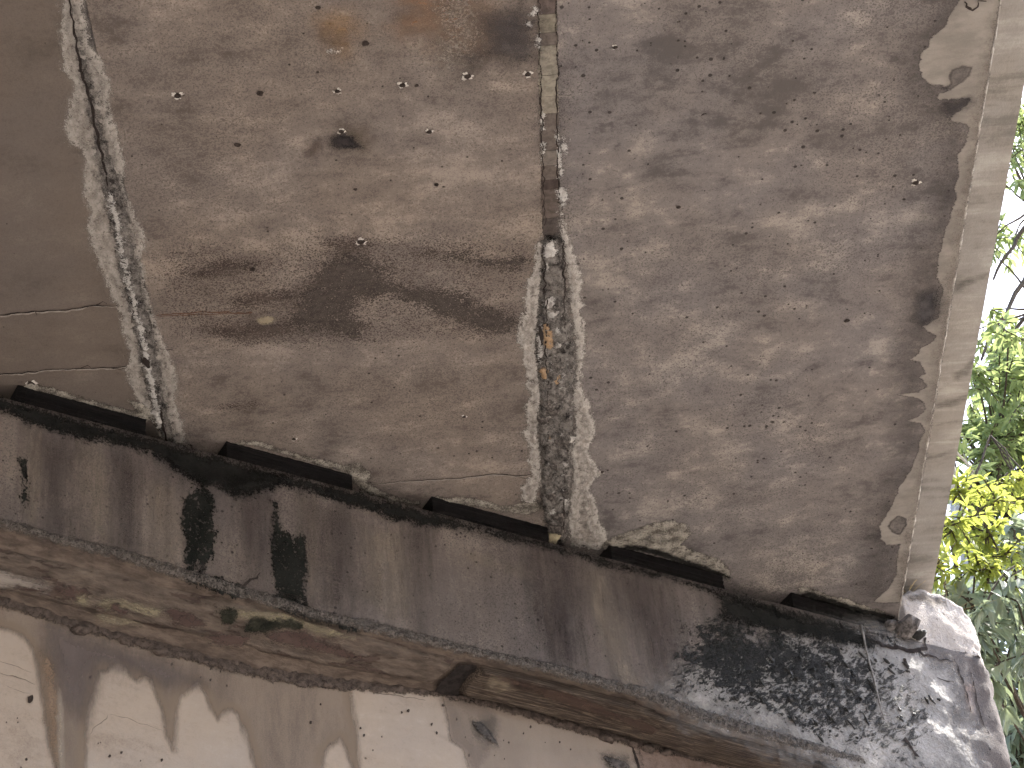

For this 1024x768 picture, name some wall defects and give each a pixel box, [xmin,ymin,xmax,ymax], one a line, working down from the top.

crack [0,301,120,317]
crack [0,365,128,375]
water stain [24,0,732,581]
water stain [795,0,1000,614]
water stain [0,606,360,768]
water stain [271,600,360,633]